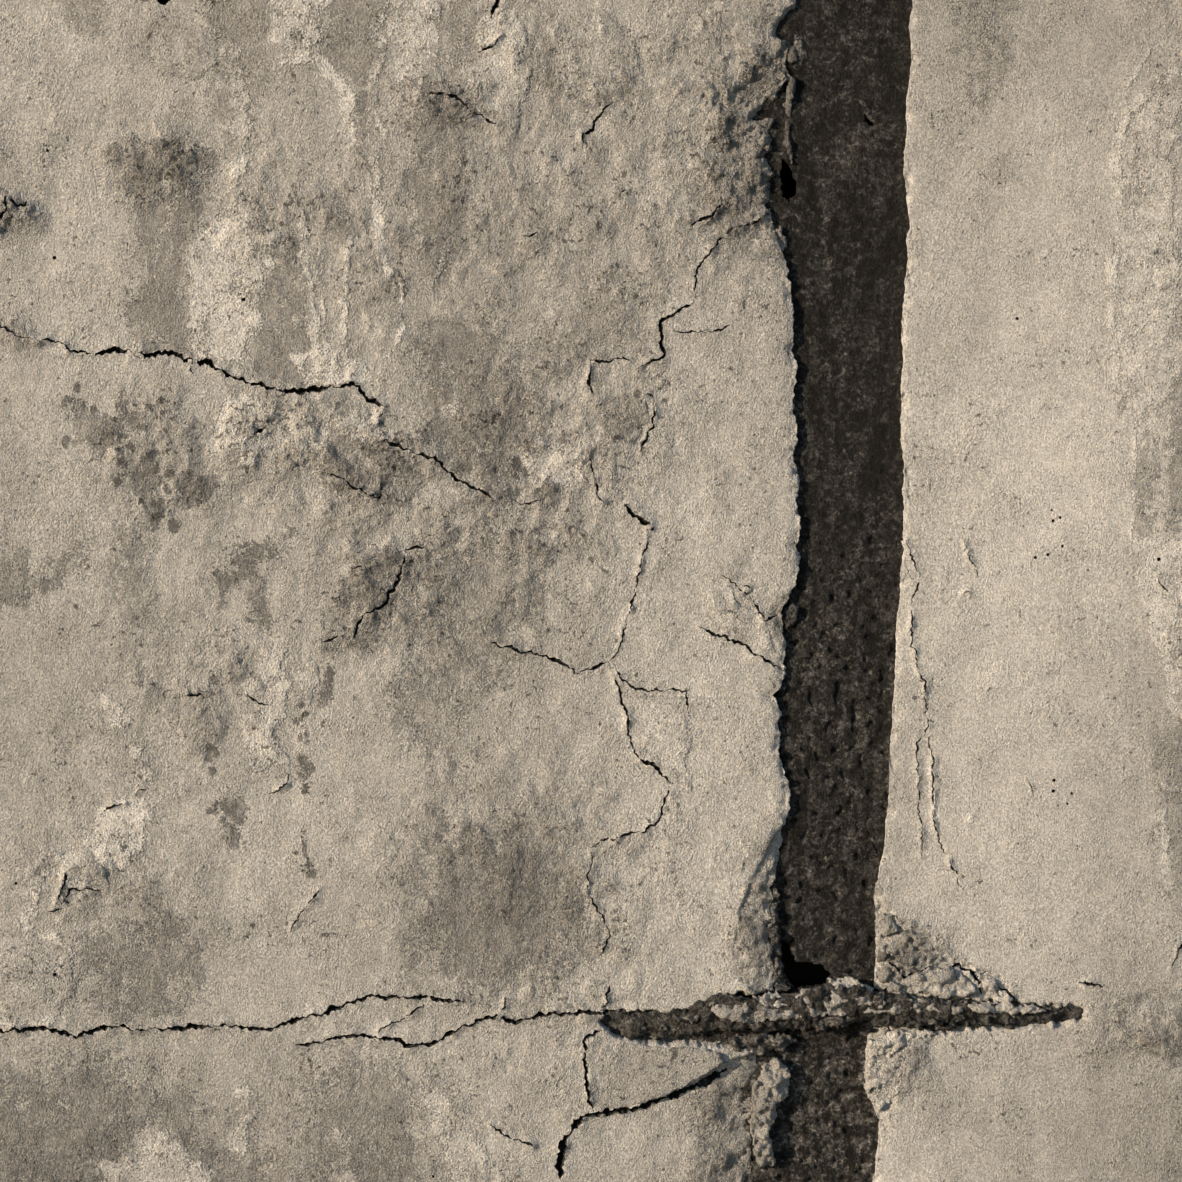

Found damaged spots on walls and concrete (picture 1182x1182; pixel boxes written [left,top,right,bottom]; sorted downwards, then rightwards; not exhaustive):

crack [477,0,502,53]
crack [0,322,540,506]
crack [583,205,764,452]
crack [104,787,149,811]
crack [322,544,428,643]
crack [490,450,691,954]
crack [700,575,786,671]
crack [901,539,960,886]
crack [48,873,104,915]
crack [289,889,319,933]
crack [0,986,726,1180]
spalling [814,884,1060,1126]